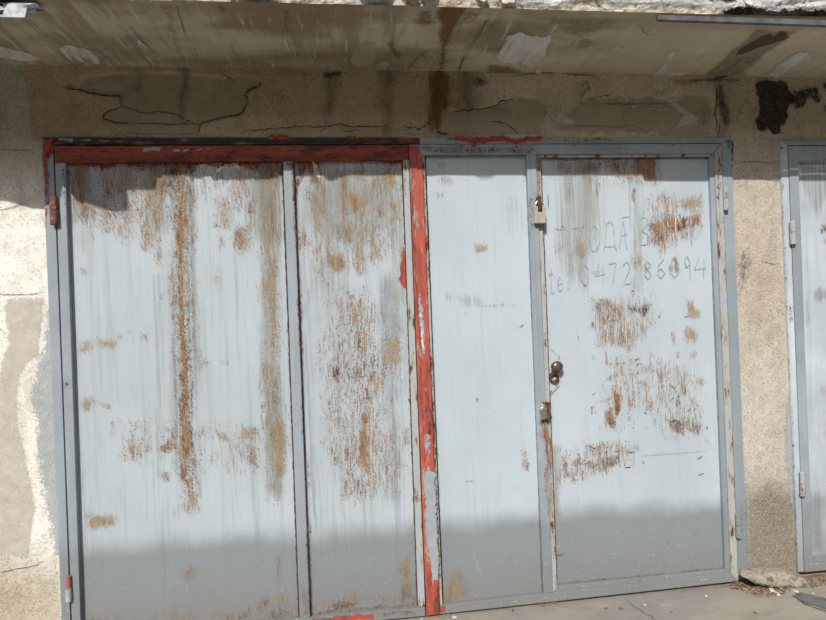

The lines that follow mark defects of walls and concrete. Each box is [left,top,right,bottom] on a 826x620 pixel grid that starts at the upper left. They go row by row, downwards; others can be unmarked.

peeling [197,0,826,17]
spalling [245,123,418,135]
spalling [438,97,547,134]
water stain [755,80,826,134]
rust [554,158,661,200]
rust [61,160,410,514]
rust [540,294,705,519]